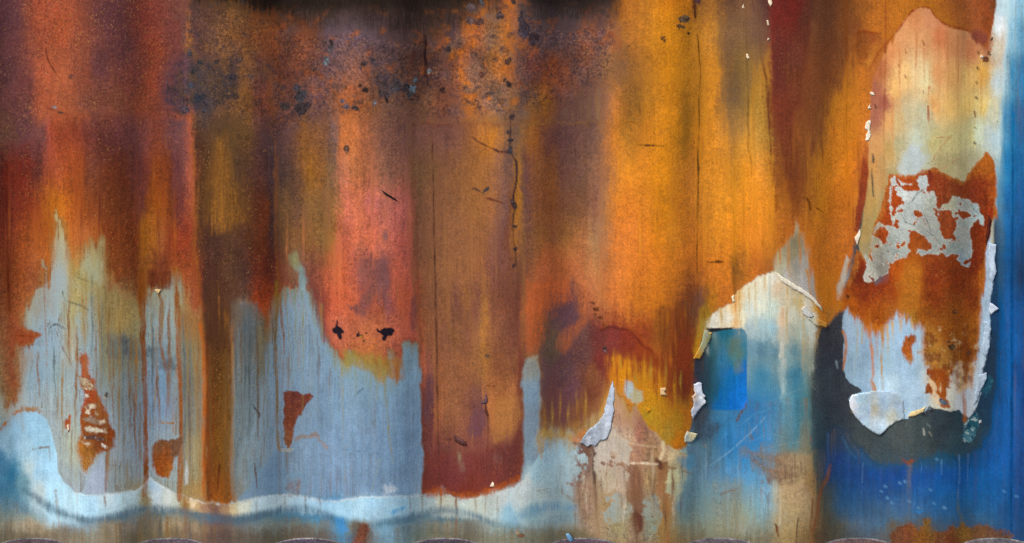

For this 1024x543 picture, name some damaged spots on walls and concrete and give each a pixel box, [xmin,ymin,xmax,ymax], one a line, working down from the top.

peeling [865,92,875,141]
corrosion [0,0,528,514]
corrosion [504,0,999,462]
peeling [986,216,997,283]
peeling [707,273,820,402]
peeling [982,303,999,358]
peeling [974,373,995,404]
peeling [302,410,698,543]
corrosion [879,456,1016,543]